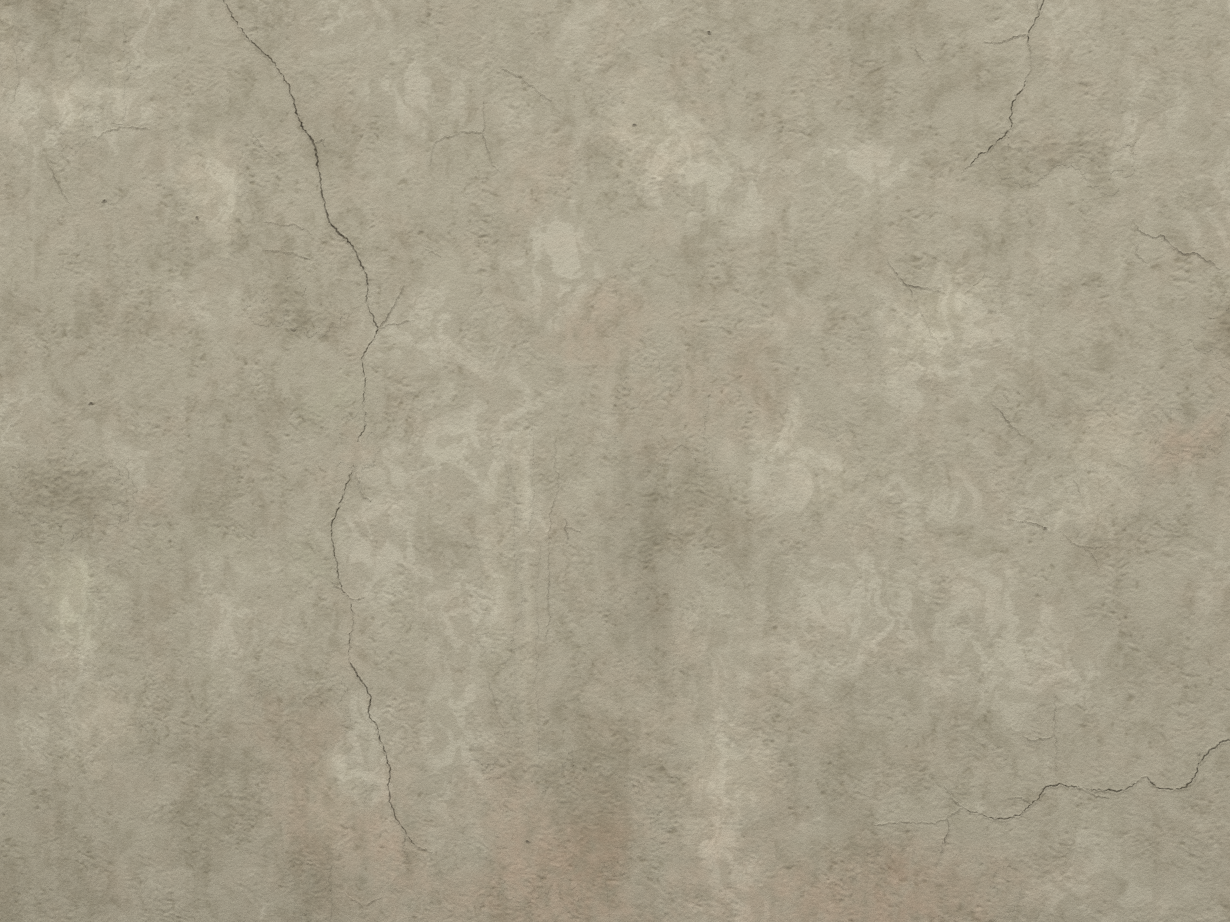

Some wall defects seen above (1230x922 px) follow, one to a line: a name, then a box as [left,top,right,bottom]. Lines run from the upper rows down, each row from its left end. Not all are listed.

crack [961,0,1047,173]
crack [222,0,432,862]
crack [874,692,1230,885]